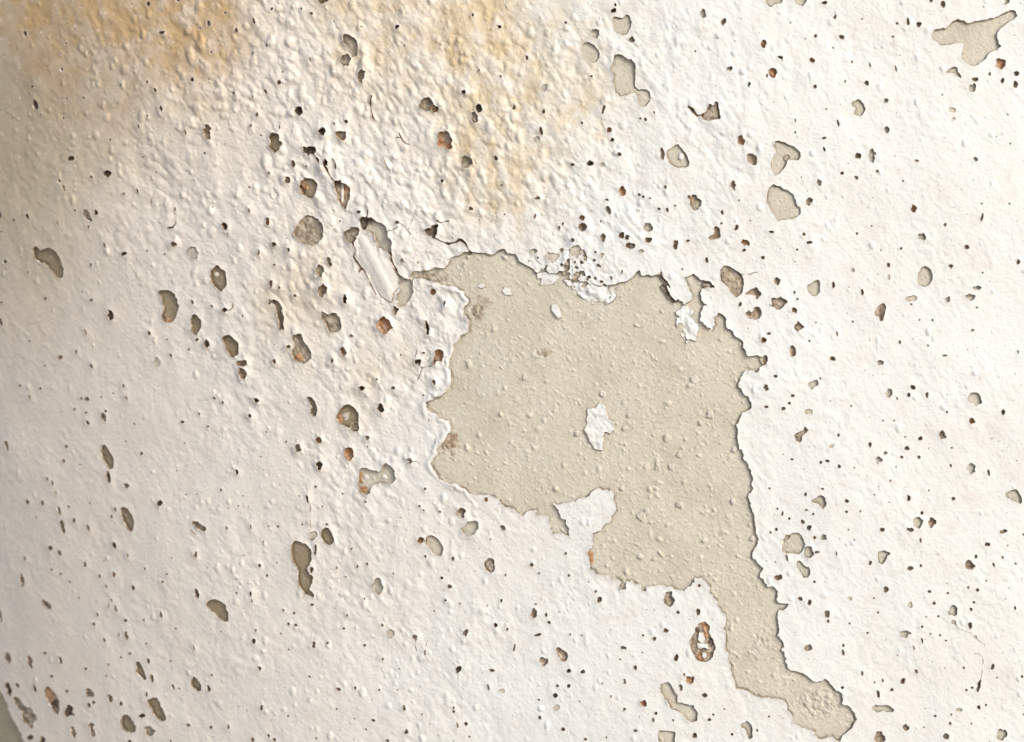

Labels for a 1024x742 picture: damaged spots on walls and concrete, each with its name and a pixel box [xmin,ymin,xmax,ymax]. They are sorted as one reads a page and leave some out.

peeling [610,54,651,107]
peeling [931,0,1019,92]
peeling [767,141,812,233]
peeling [34,247,64,278]
peeling [344,215,856,742]
peeling [291,528,334,597]